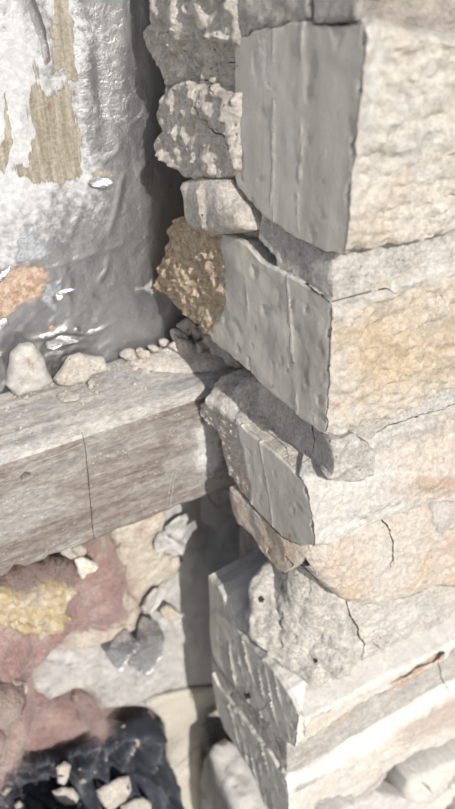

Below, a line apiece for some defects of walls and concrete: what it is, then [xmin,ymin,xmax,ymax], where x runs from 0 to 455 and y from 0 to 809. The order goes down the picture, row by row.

peeling [0,0,114,188]
peeling [0,234,75,330]
crack [381,520,394,568]
crack [346,601,379,661]